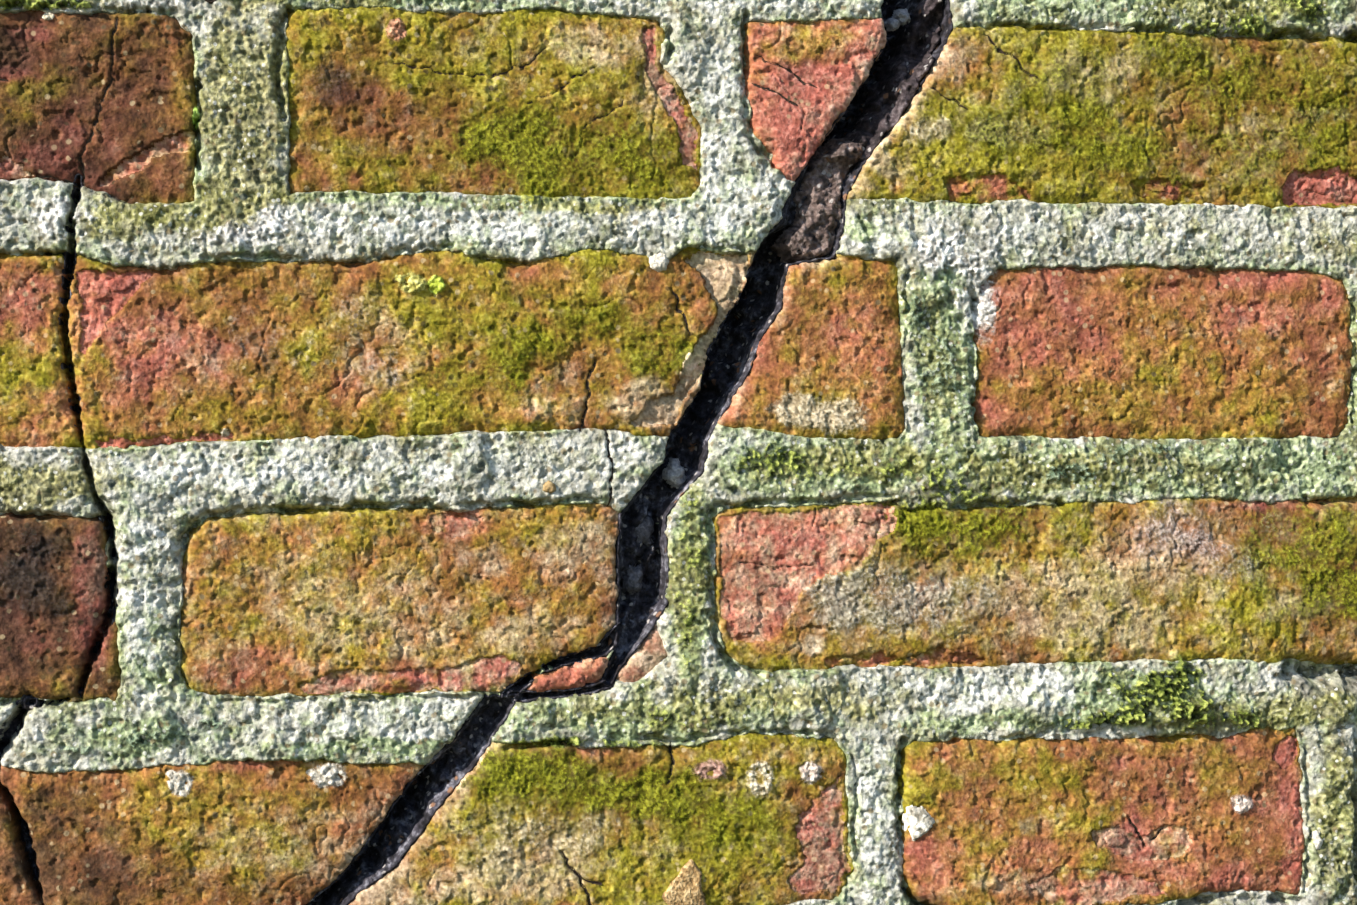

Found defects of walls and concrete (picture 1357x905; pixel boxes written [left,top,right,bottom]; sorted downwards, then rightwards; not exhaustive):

crack [986,35,1037,77]
crack [38,17,126,443]
crack [306,0,967,905]
crack [93,503,119,654]
crack [0,687,83,770]
crack [16,807,40,881]